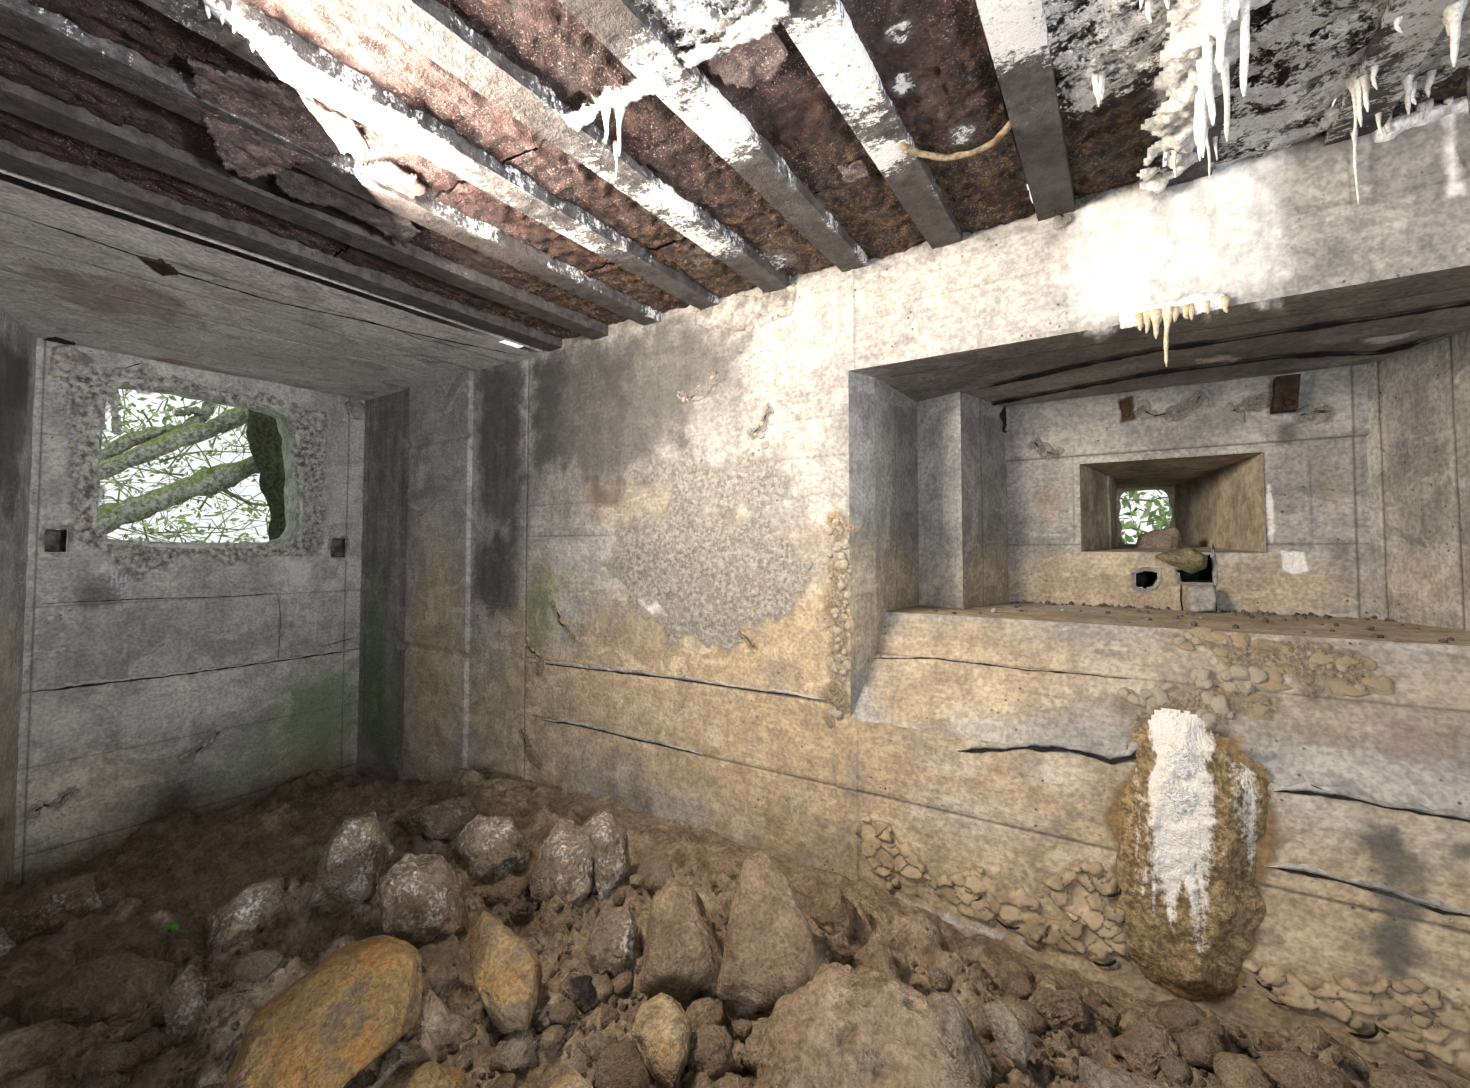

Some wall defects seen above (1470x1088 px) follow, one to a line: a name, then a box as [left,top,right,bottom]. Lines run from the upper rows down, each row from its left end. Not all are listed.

leakage [636,0,789,68]
corrosion [690,18,788,89]
leakage [562,71,668,178]
leakage [1401,0,1470,198]
corrosion [838,159,869,184]
leakage [1041,0,1403,326]
spalling [735,623,758,650]
crack [957,738,1140,765]
leakage [1105,708,1275,1001]
crack [1264,863,1470,917]